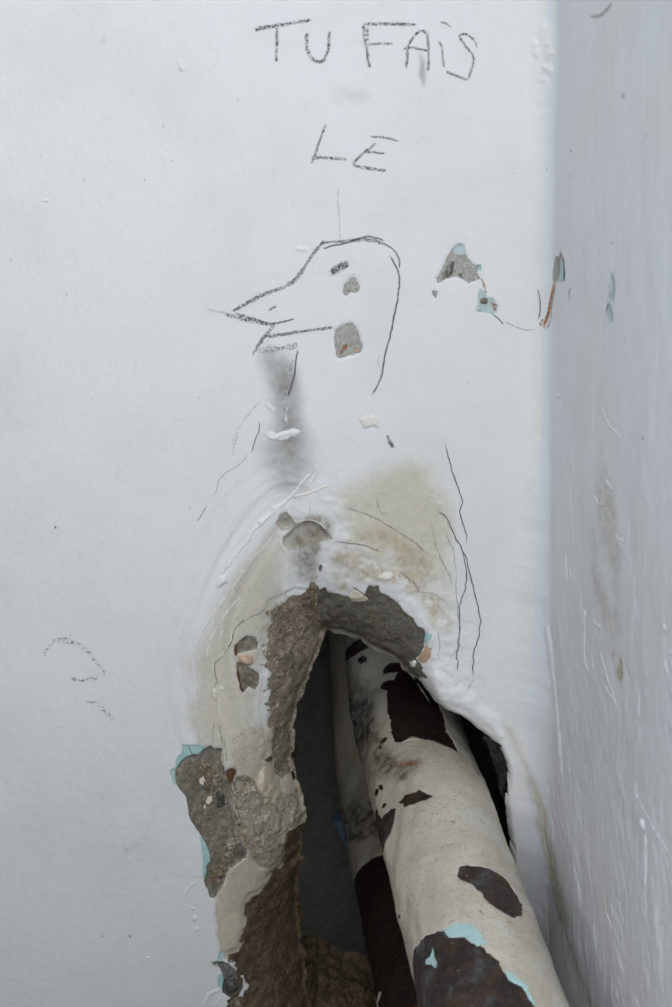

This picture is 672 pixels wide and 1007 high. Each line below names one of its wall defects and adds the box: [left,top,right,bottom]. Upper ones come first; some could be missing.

peeling [343,277,360,296]
peeling [432,243,499,314]
peeling [540,252,564,328]
peeling [334,322,363,358]
spalling [170,582,432,1007]
spalling [482,734,510,849]
peeling [425,949,437,968]